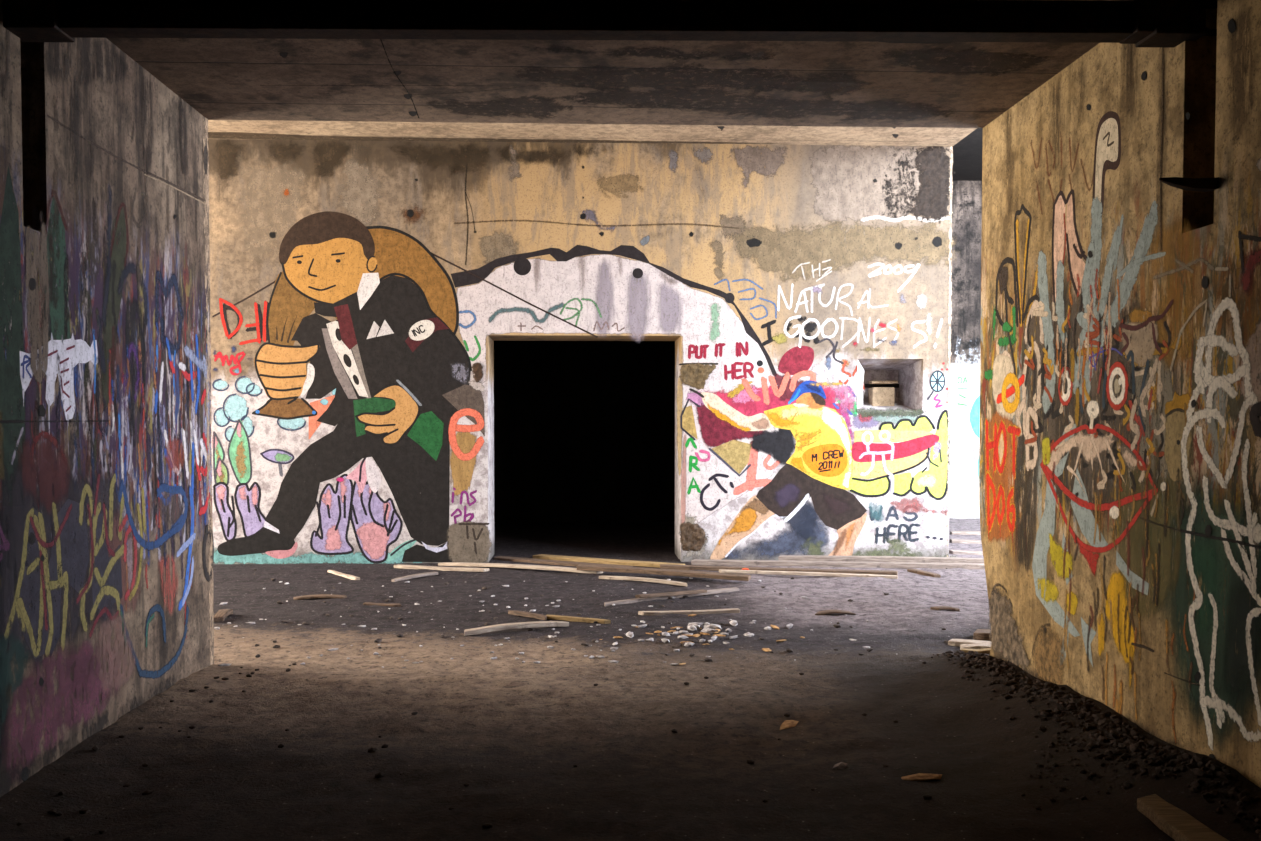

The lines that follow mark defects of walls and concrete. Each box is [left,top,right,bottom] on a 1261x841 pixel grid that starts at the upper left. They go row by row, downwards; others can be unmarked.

water stain [426,45,953,121]
water stain [208,132,776,181]
peeling [479,231,518,264]
peeling [710,127,955,557]